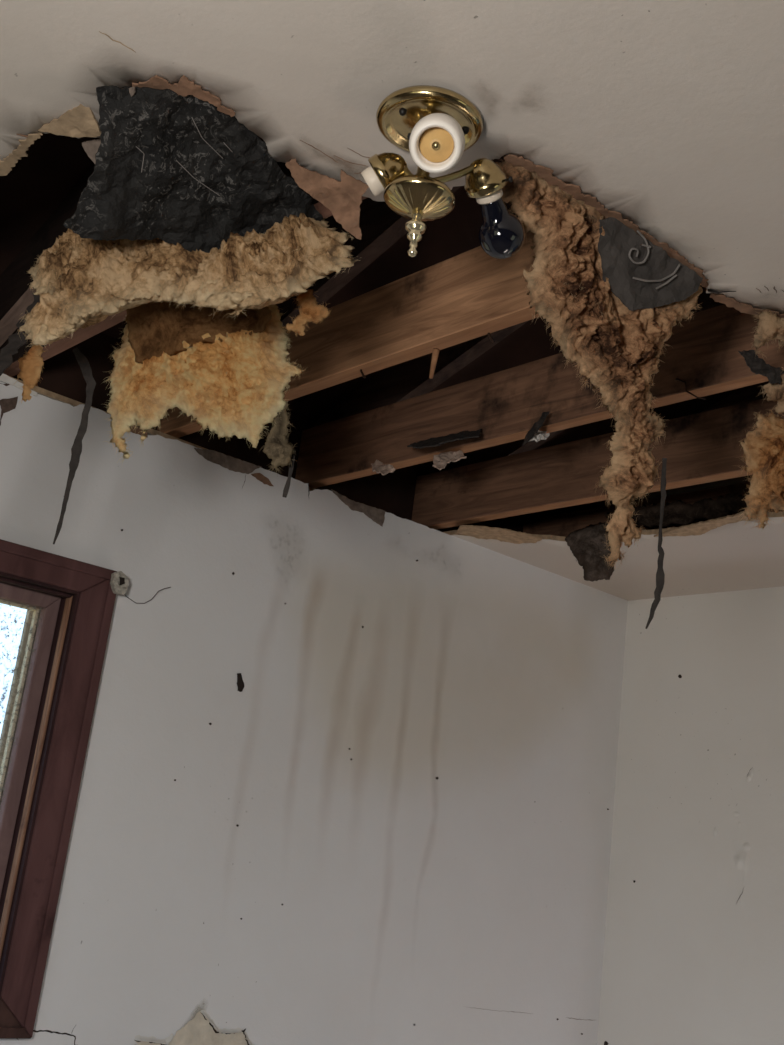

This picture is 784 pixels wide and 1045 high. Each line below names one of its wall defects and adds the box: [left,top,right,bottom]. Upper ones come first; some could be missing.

spalling [132,75,235,117]
spalling [0,131,43,176]
spalling [504,154,784,318]
peeling [0,396,18,425]
spalling [194,448,273,486]
spalling [331,489,385,527]
peeling [135,1008,255,1045]